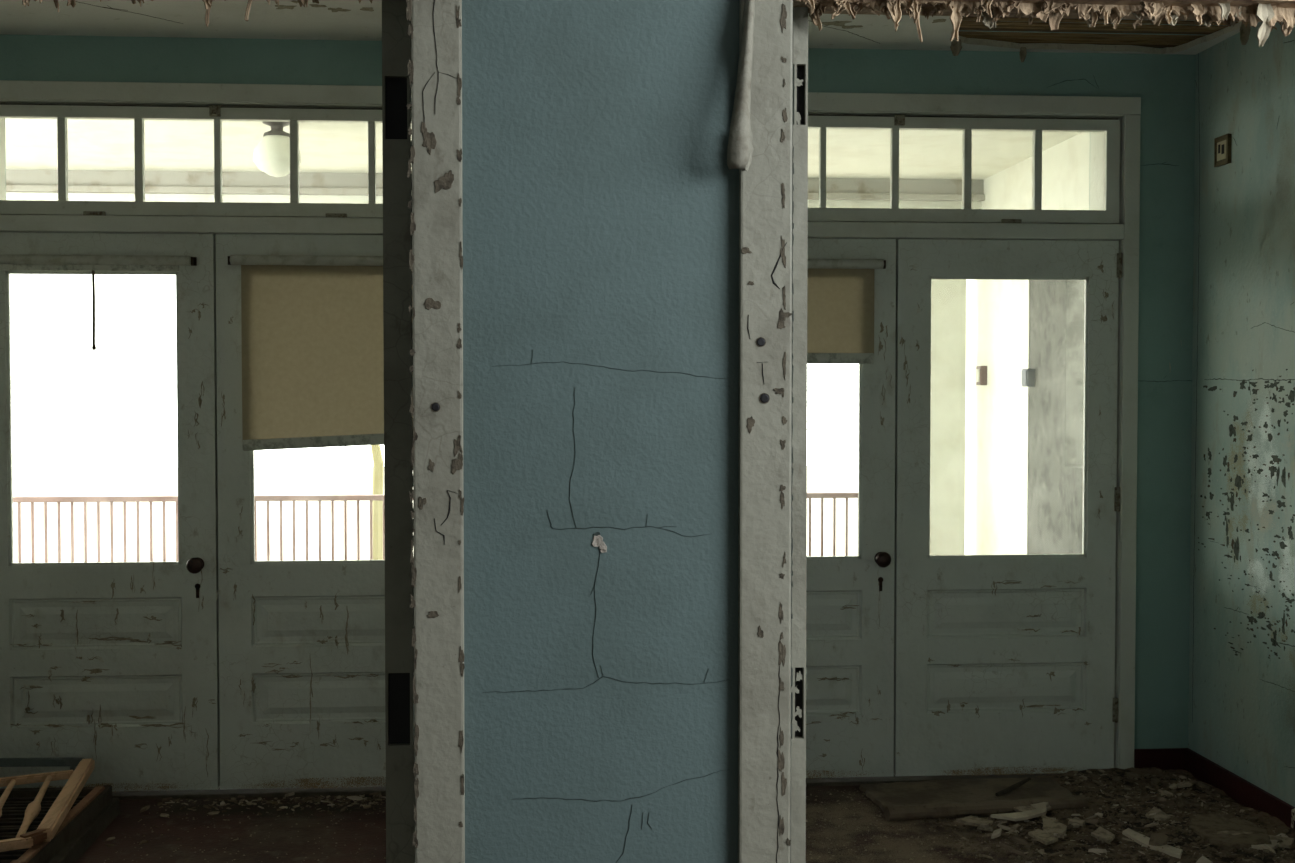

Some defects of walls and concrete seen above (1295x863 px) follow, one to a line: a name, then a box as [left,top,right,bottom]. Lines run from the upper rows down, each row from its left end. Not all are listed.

peeling [244,0,374,21]
spalling [780,0,1295,62]
peeling [407,122,437,178]
peeling [434,149,462,207]
peeling [409,298,441,318]
peeling [451,435,465,516]
peeling [1198,369,1295,659]
spalling [409,490,439,704]
spalling [778,602,786,691]
spalling [778,728,787,795]